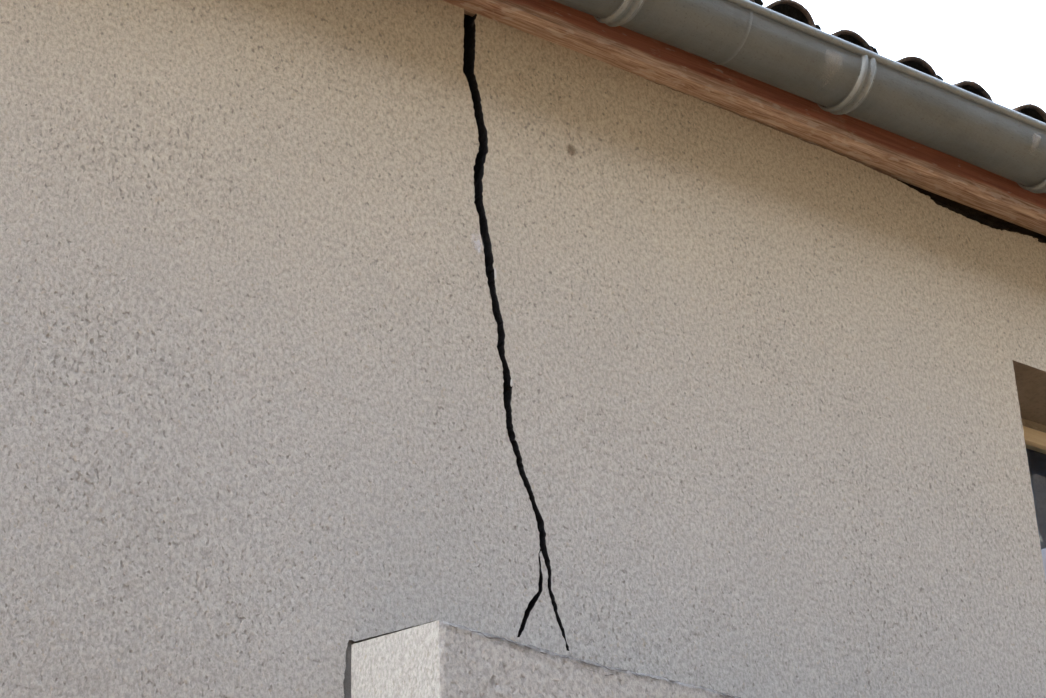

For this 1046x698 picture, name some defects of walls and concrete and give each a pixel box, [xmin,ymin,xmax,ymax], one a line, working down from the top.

crack [450,14,675,682]